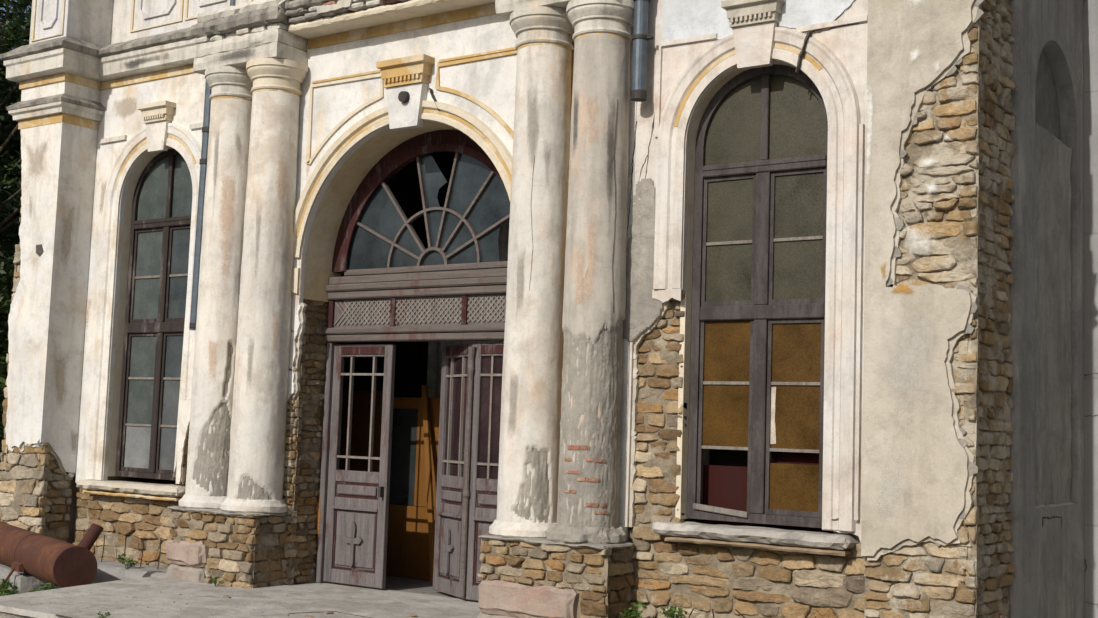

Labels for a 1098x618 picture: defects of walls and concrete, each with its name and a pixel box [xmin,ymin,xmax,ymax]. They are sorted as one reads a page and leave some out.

crack [780,0,859,74]
flaking render [11,242,21,303]
flaking render [512,0,1017,618]
flaking render [0,354,179,568]
flaking render [175,299,328,585]